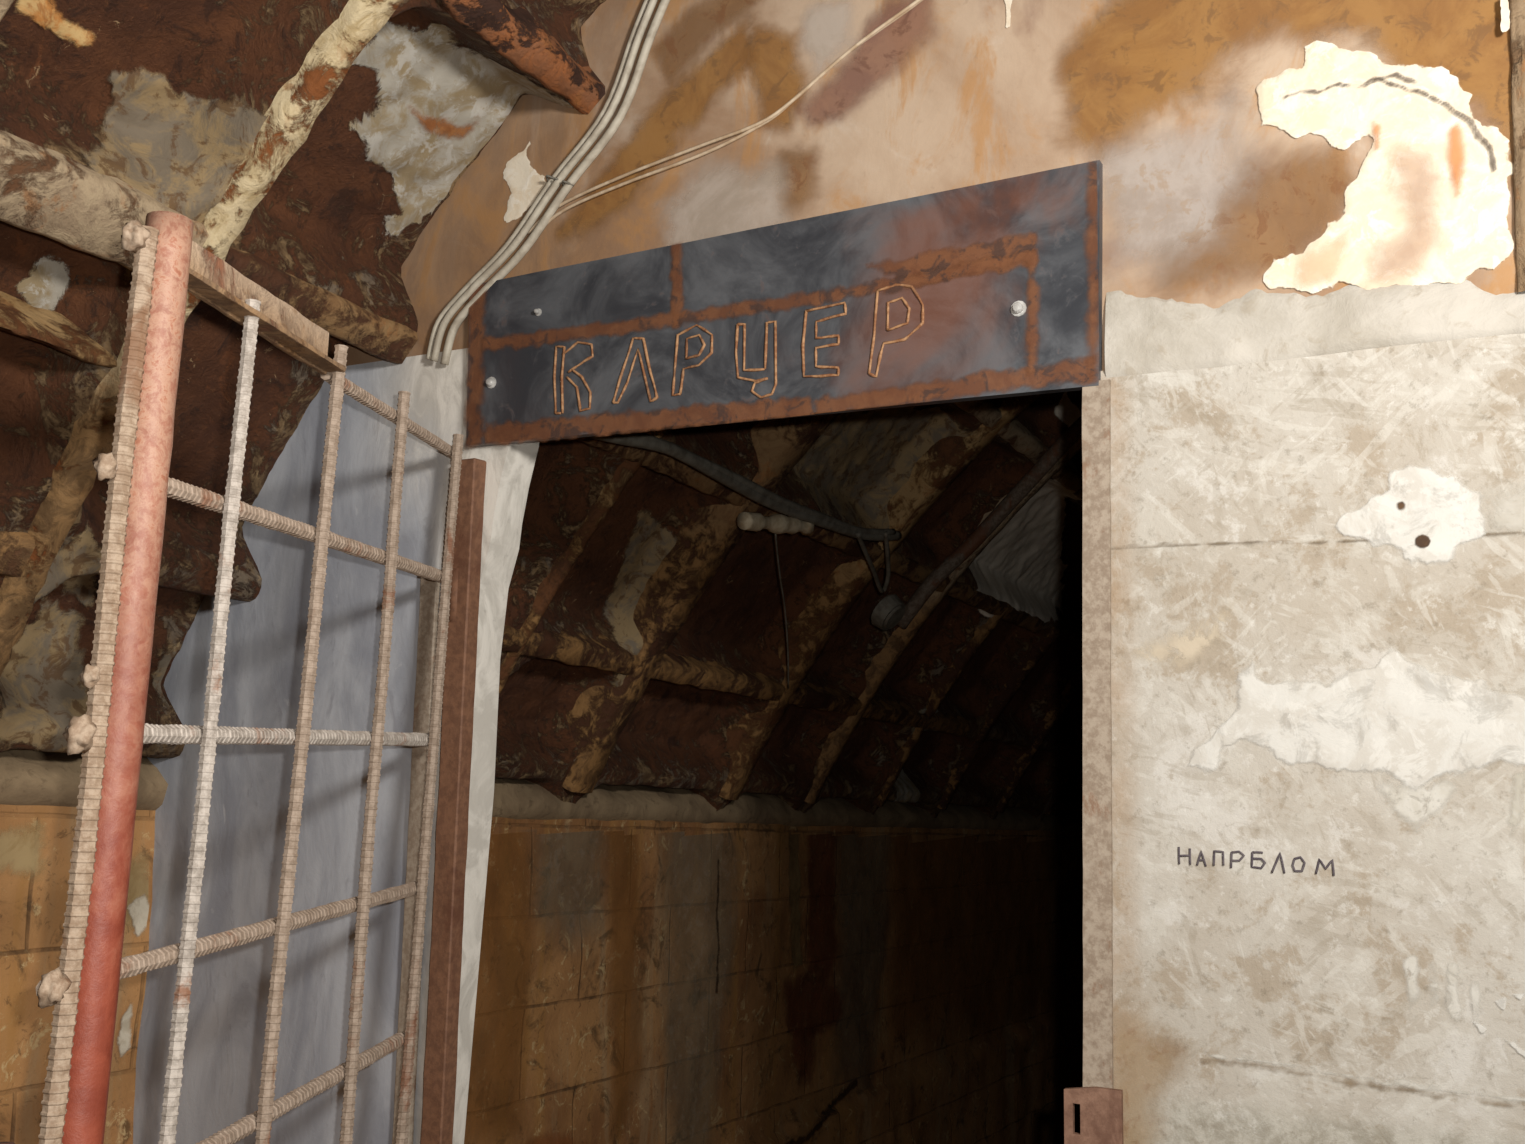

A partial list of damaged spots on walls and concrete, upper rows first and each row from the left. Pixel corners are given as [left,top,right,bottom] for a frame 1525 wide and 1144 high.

rust [418,115,472,138]
flaking render [1256,41,1514,294]
crack [1286,72,1497,170]
peeling [1336,465,1525,563]
peeling [1189,649,1525,831]
crack [786,1080,858,1144]